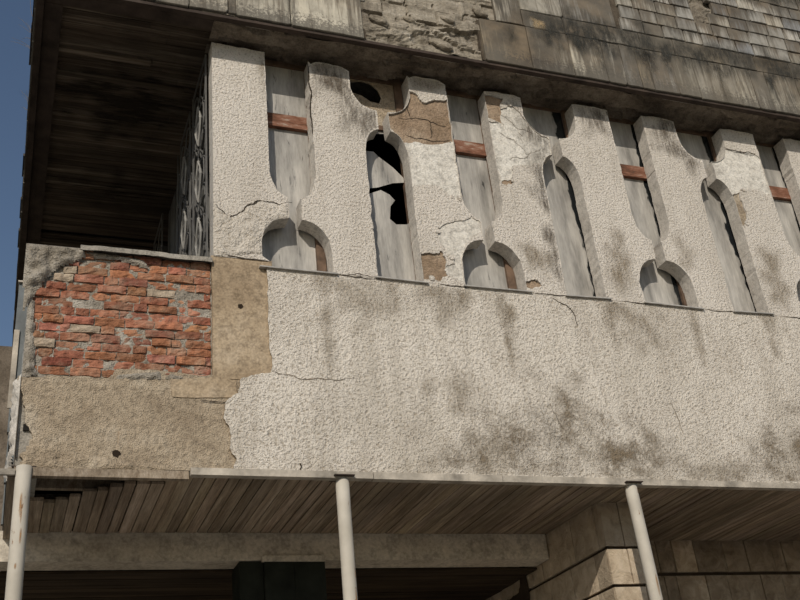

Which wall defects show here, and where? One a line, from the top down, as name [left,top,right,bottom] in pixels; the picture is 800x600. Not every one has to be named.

spalling [389,93,462,201]
crack [216,200,292,217]
peeling [421,216,481,281]
flaking render [3,243,272,481]
leakage [601,441,642,470]